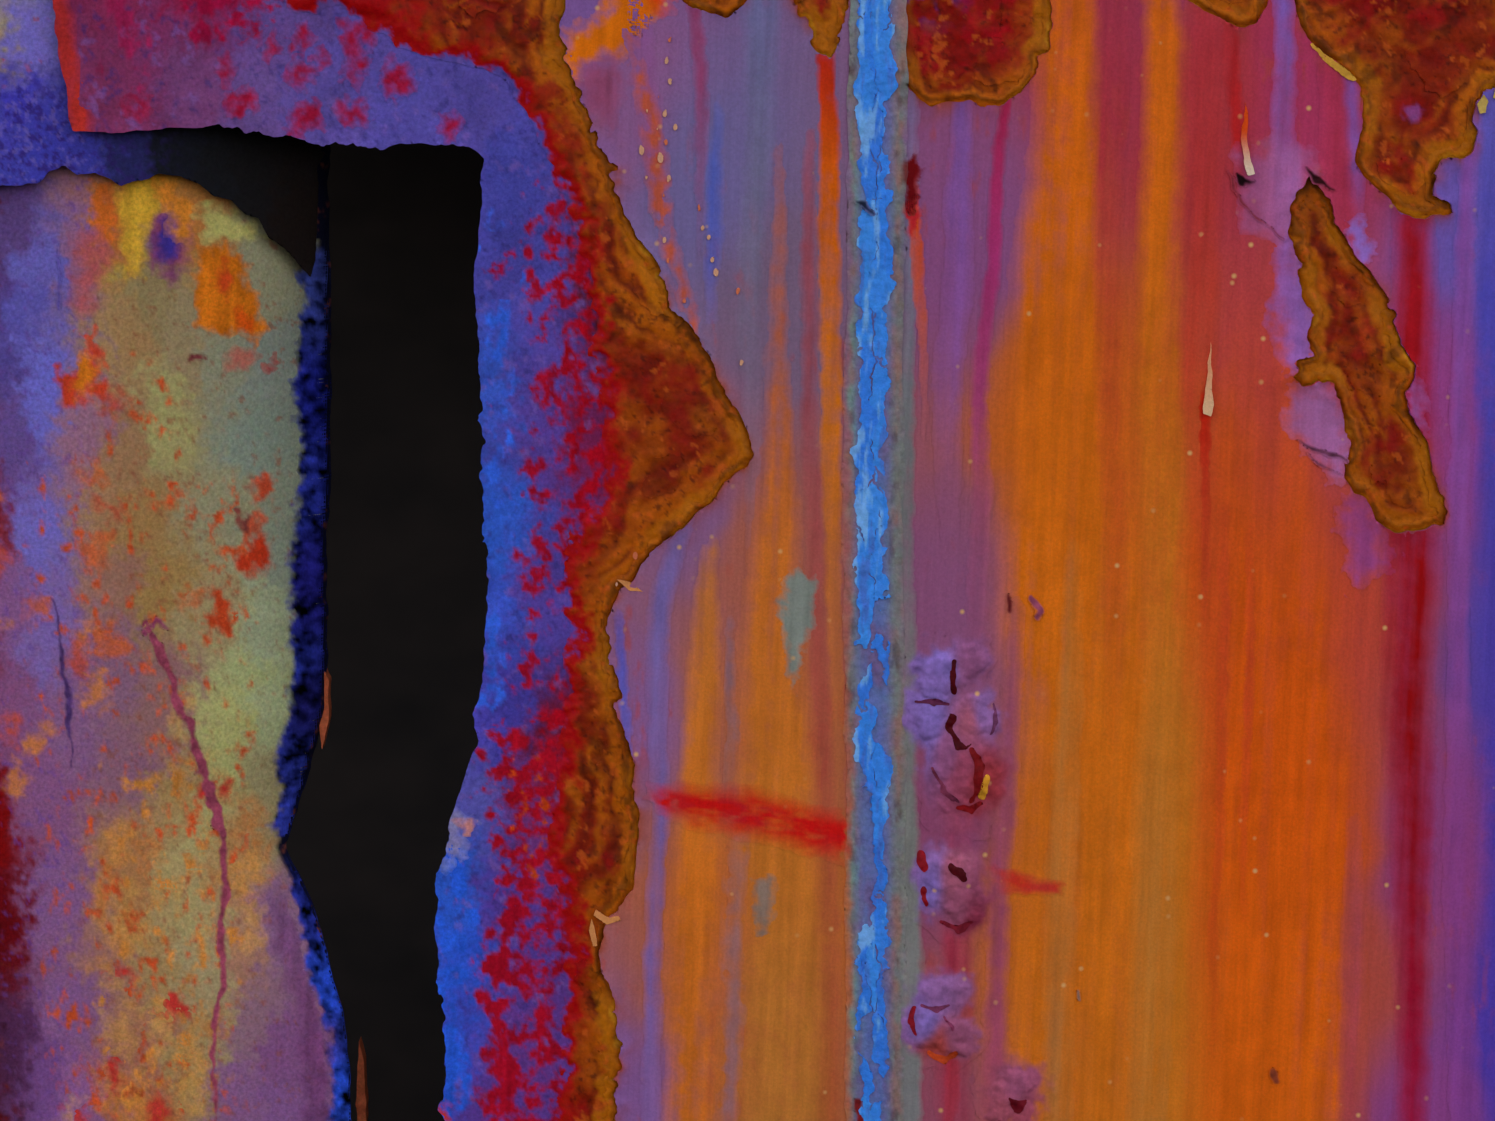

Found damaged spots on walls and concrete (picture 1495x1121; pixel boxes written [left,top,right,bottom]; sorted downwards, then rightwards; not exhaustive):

peeling [59,5,554,269]
rust [0,174,302,1121]
peeling [284,240,331,828]
rust [53,0,849,1121]
peeling [436,331,523,925]
rust [906,0,1495,1121]
peeling [280,865,351,1121]
peeling [436,967,453,1121]